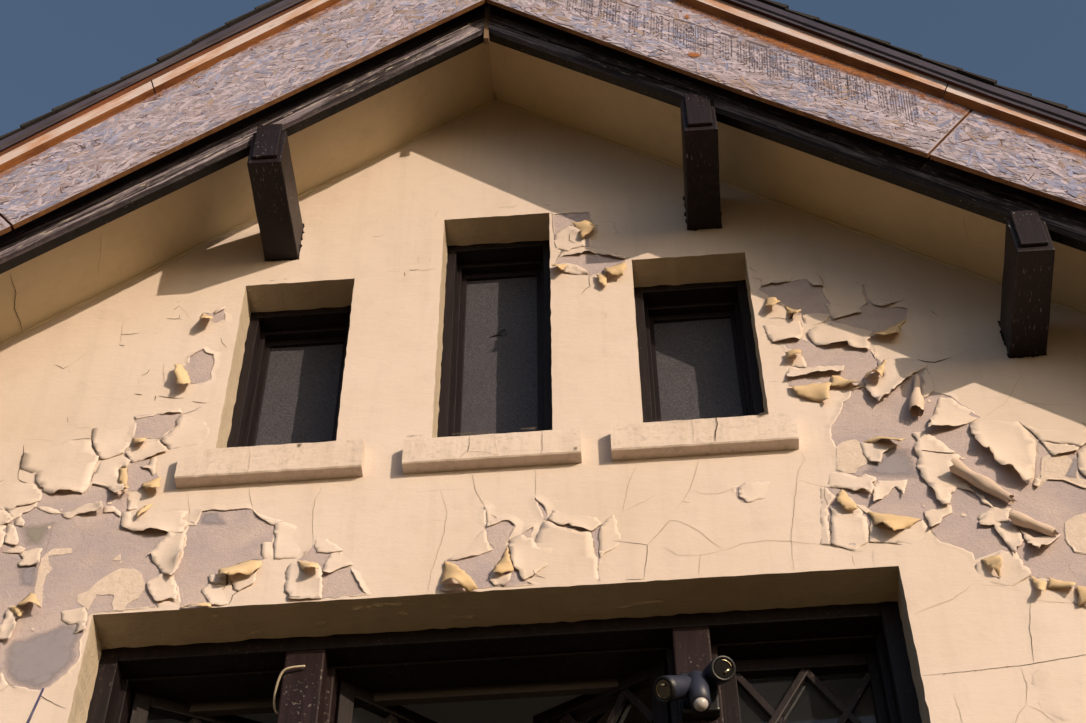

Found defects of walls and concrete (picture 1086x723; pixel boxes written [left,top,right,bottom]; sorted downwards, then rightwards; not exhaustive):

peeling [549,208,627,285]
peeling [0,408,372,700]
peeling [174,345,221,387]
crack [420,435,543,587]
peeling [440,493,621,593]
crack [614,417,902,580]
peeling [756,276,1086,607]
crack [922,584,1086,723]